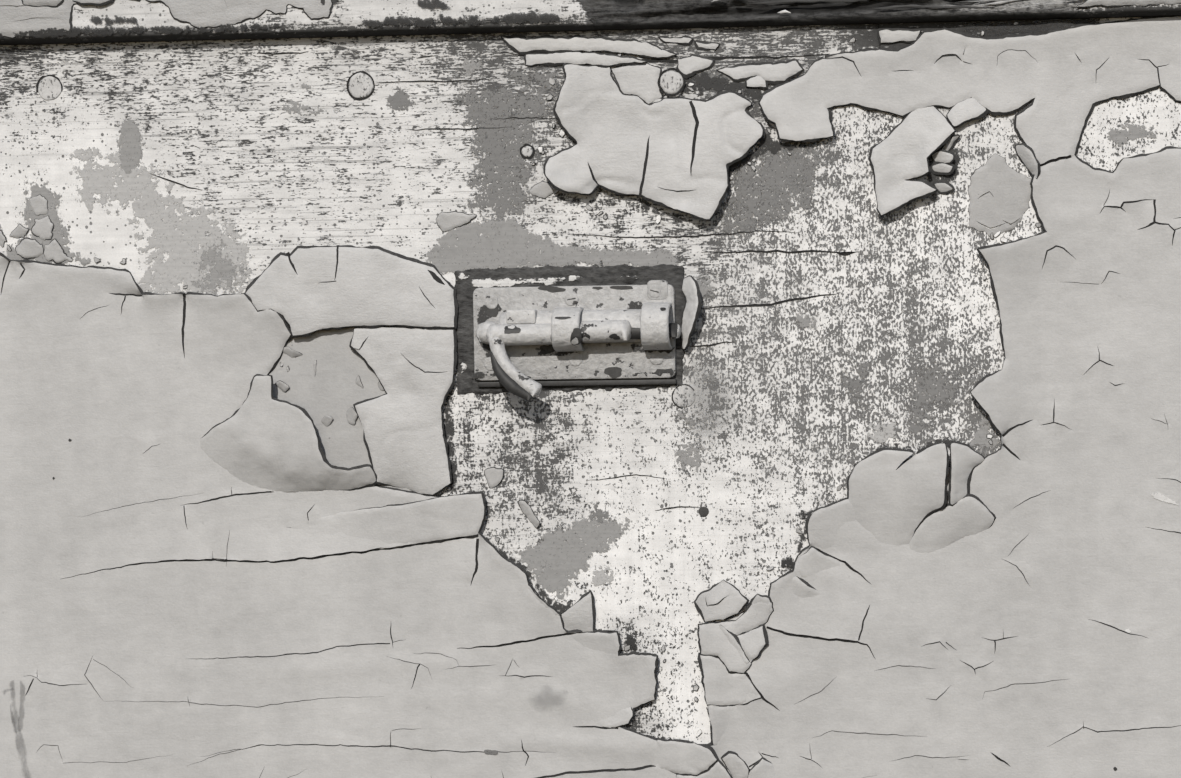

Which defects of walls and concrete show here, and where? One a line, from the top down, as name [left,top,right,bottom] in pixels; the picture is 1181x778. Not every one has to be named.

peeling [500,34,678,104]
peeling [543,63,795,222]
peeling [868,97,988,217]
crack [582,230,861,256]
crack [701,294,835,309]
peeling [200,245,458,496]
crack [62,532,479,584]
peeling [798,441,996,578]
crack [200,627,615,687]
peeling [694,579,774,746]
crack [767,549,1067,700]
crack [38,729,656,778]